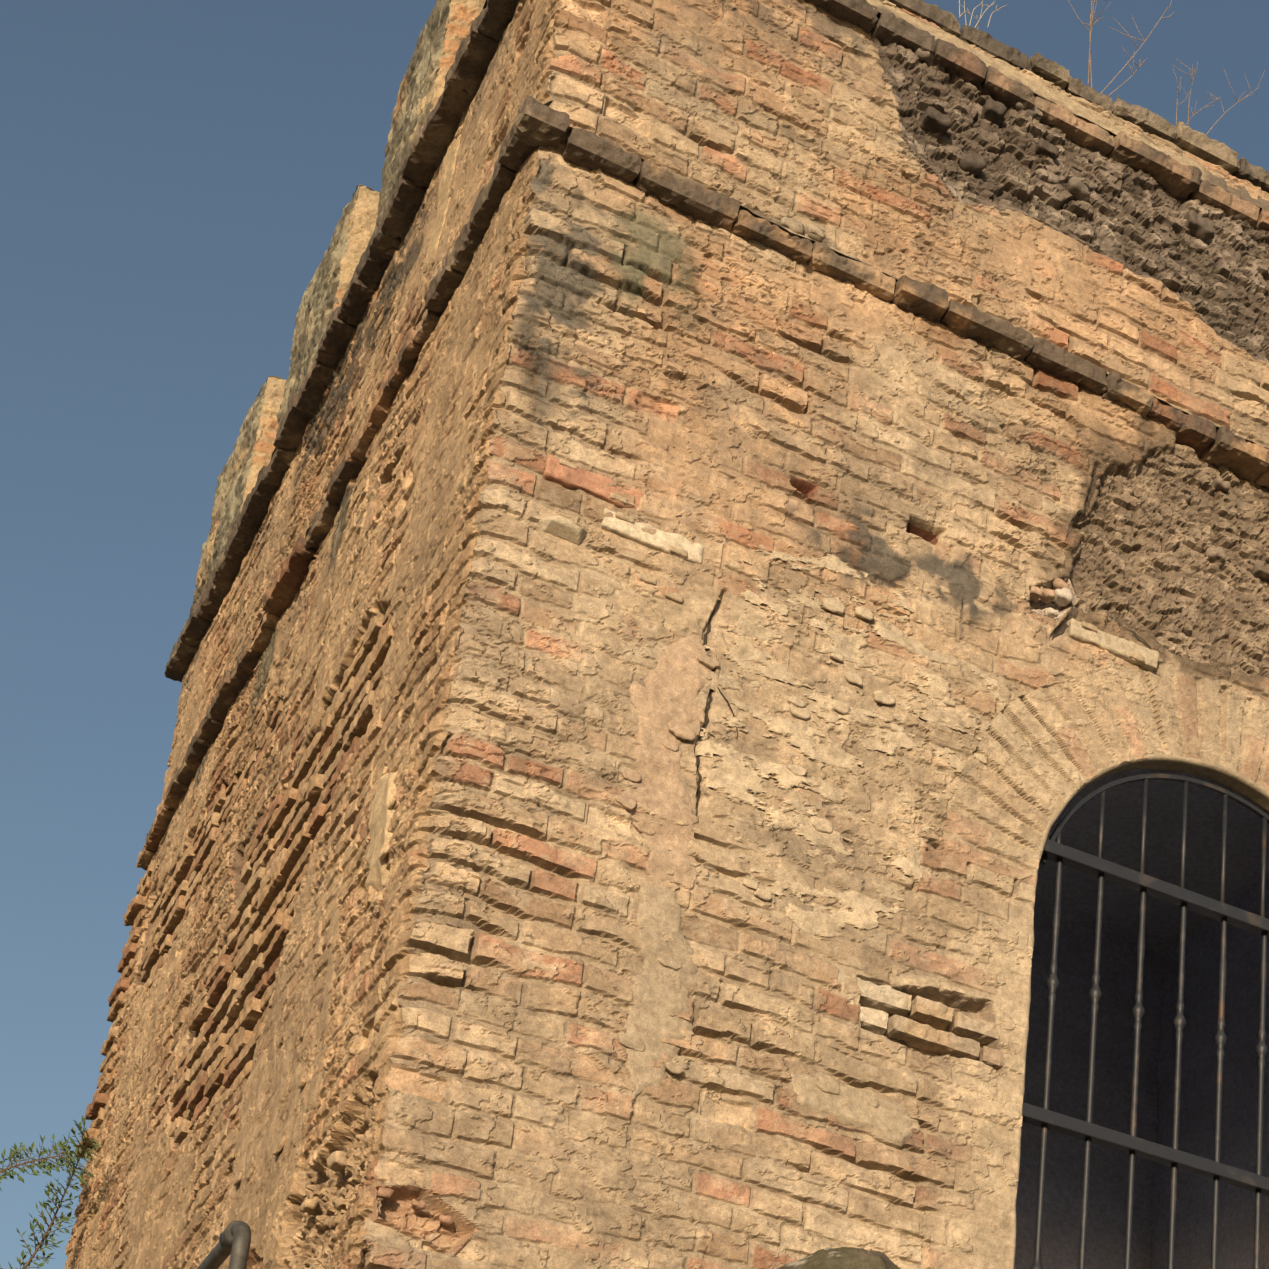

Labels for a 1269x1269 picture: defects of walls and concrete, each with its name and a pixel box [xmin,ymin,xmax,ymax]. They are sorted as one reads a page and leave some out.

spalling [871,16,1269,363]
spalling [1029,422,1269,683]
spalling [133,699,285,993]
spalling [160,604,395,1152]
crack [696,594,738,816]
spalling [246,1072,479,1269]